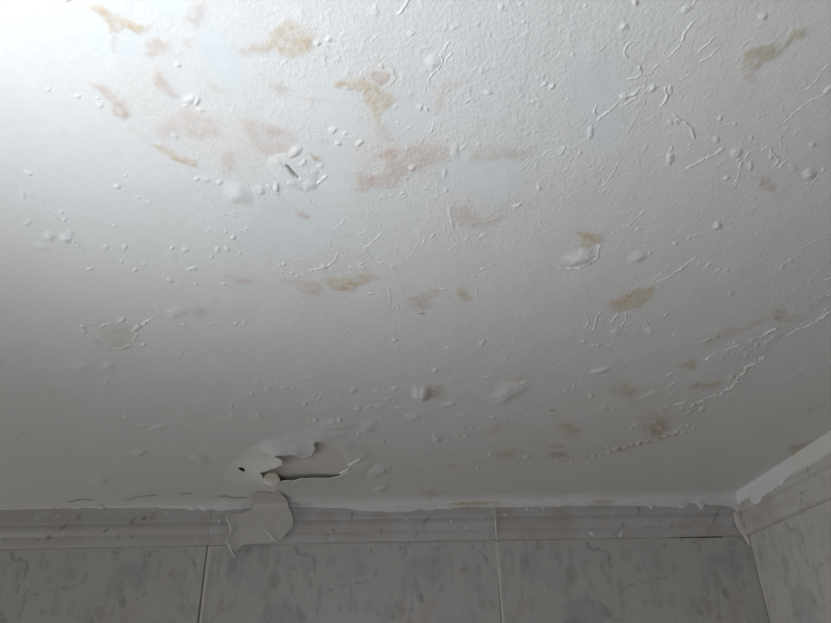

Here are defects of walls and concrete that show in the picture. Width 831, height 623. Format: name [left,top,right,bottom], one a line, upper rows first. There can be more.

leakage [82,0,340,178]
leakage [261,66,541,194]
leakage [726,24,813,108]
leakage [217,267,381,300]
leakage [600,283,659,314]
peeling [225,442,350,558]